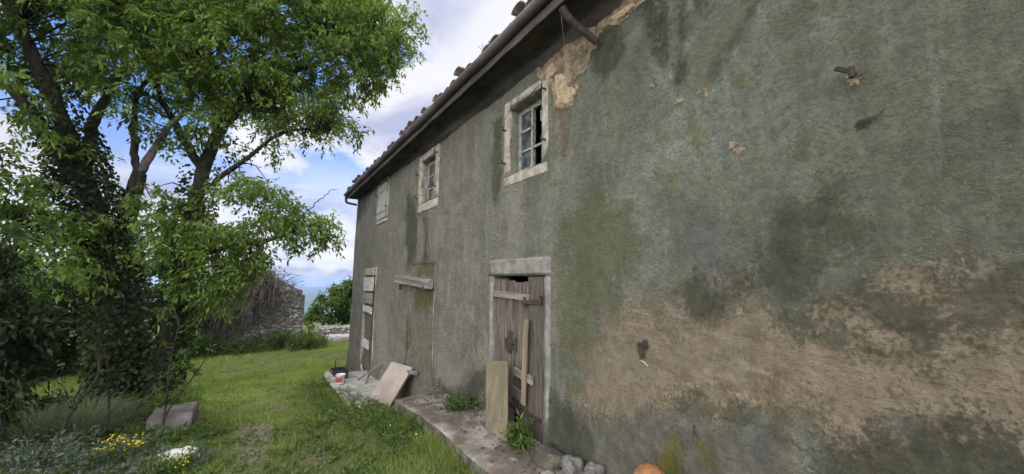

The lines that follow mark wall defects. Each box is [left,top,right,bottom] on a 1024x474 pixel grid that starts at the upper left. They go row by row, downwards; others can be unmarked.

flaking render [535,0,645,109]
leakage [592,26,624,76]
leakage [640,0,745,95]
leakage [490,118,503,202]